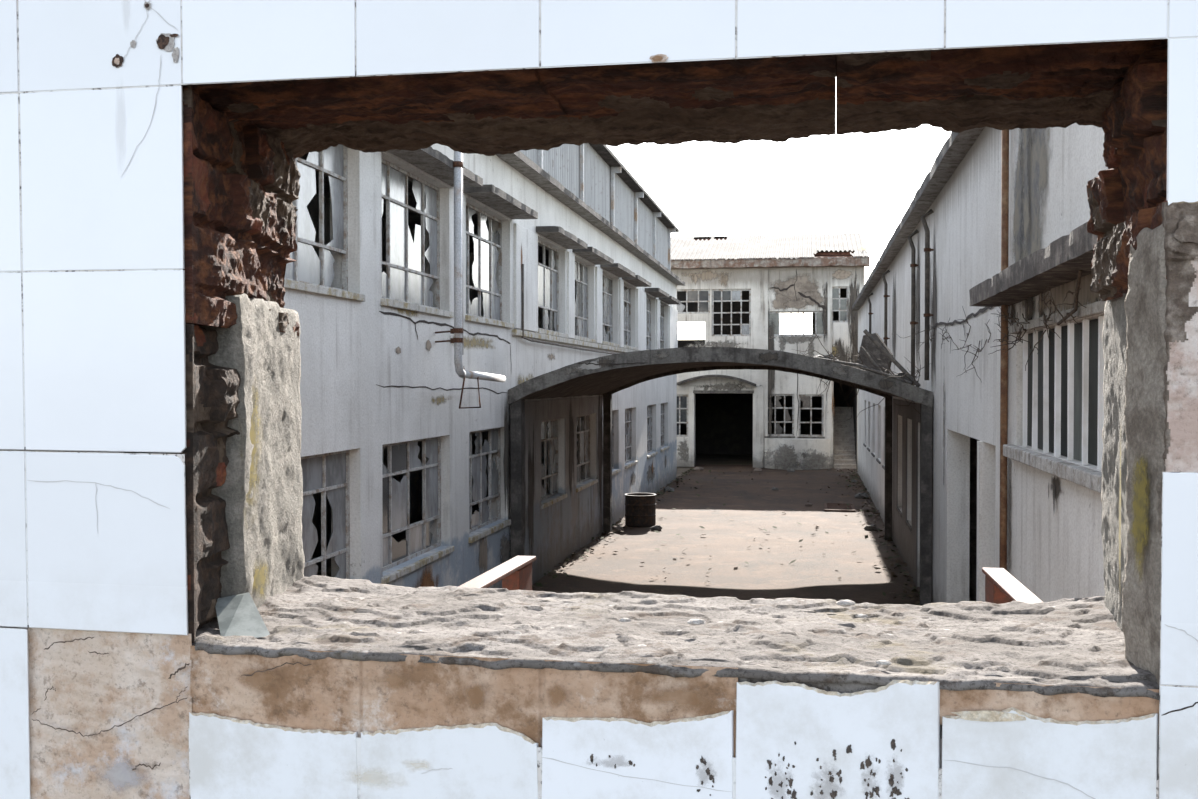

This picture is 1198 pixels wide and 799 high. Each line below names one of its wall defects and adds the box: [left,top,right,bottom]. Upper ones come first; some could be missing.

spalling [112,40,136,68]
crack [123,0,176,58]
spalling [156,33,179,63]
crack [122,56,161,175]
peeling [1162,202,1198,472]
crack [28,480,170,531]
peeling [28,627,738,799]
crack [1163,702,1198,715]
water stain [696,756,714,796]
water stain [765,739,909,799]